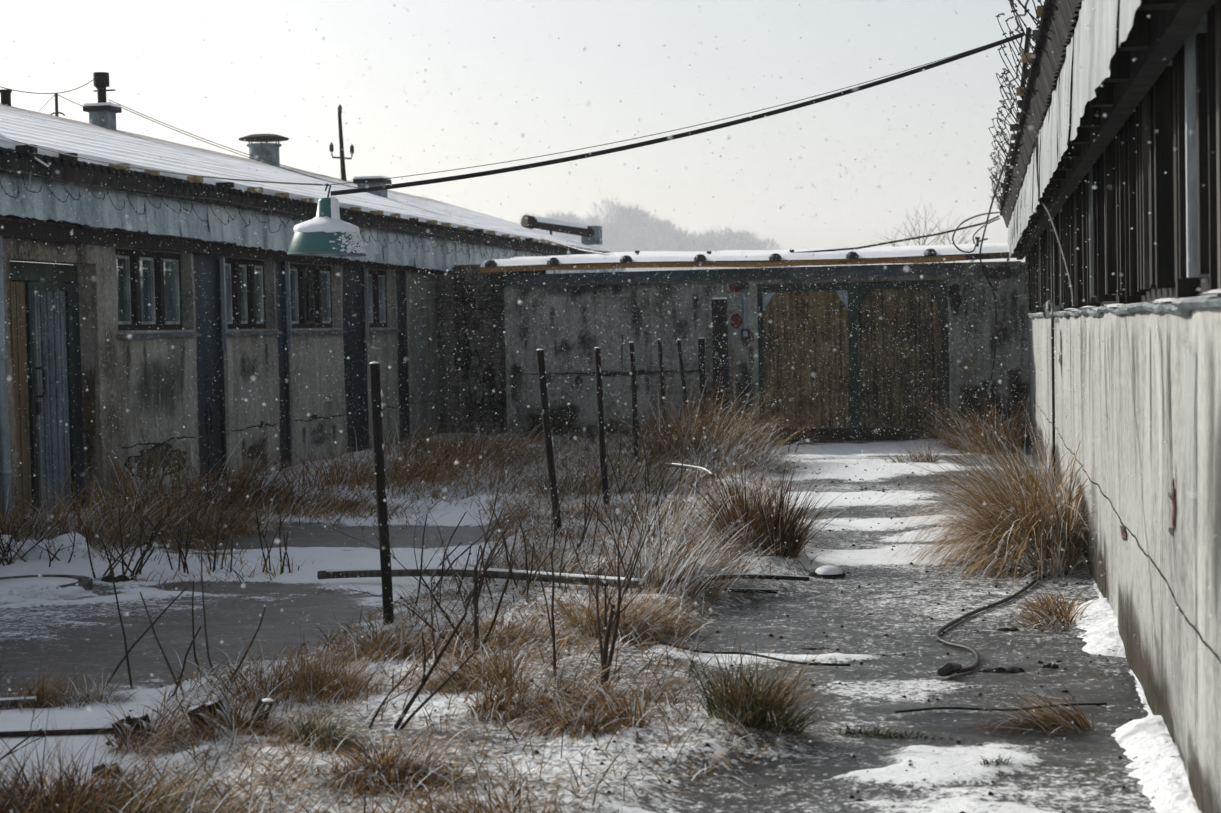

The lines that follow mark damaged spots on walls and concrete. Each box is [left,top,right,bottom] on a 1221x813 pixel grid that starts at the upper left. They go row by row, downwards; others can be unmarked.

leakage [551,284,648,339]
leakage [982,265,1025,350]
leakage [555,335,660,392]
crack [119,436,195,463]
leakage [959,356,1061,494]